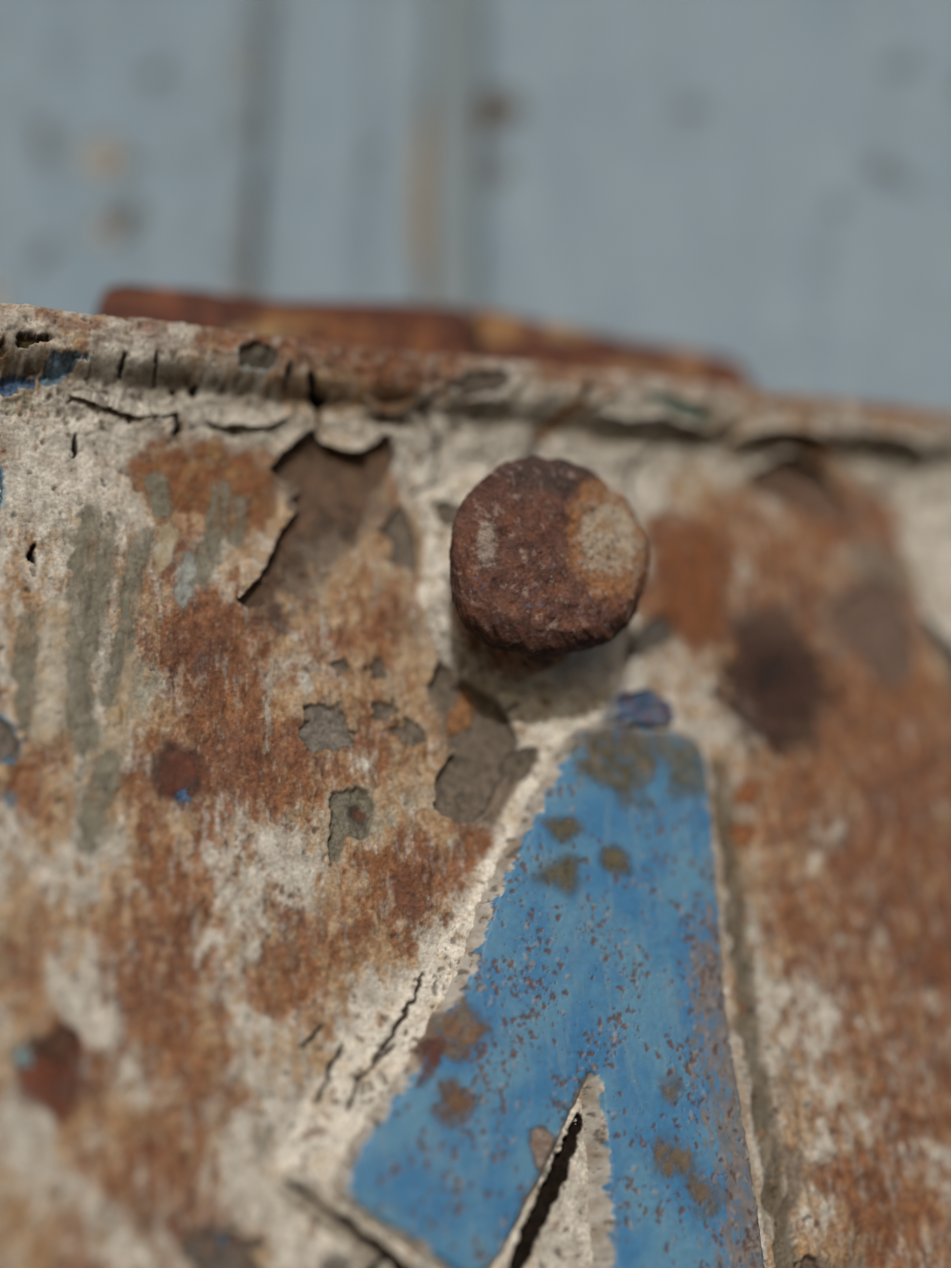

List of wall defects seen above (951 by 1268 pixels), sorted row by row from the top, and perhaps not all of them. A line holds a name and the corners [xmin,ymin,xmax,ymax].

crack [26,543,36,563]
crack [70,435,78,459]
rust [128,426,275,537]
peeling [205,411,418,608]
peeling [746,445,849,524]
rust [646,507,848,758]
rust [160,743,200,802]
peeling [371,699,427,748]
peeling [423,642,539,824]
crack [283,1178,408,1268]
crack [509,1113,582,1268]
rust [655,1140,718,1213]